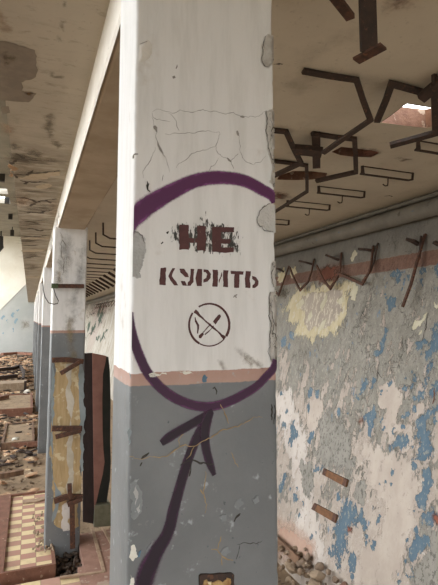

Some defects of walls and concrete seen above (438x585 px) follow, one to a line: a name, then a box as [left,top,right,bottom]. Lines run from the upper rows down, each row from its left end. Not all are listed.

spalling [261,34,274,67]
crack [133,109,266,192]
spalling [381,104,432,128]
spalling [132,231,146,278]
spalling [257,203,276,233]
spalling [268,261,358,363]
peeling [49,362,86,531]
crack [129,387,276,513]
peeling [276,313,438,585]